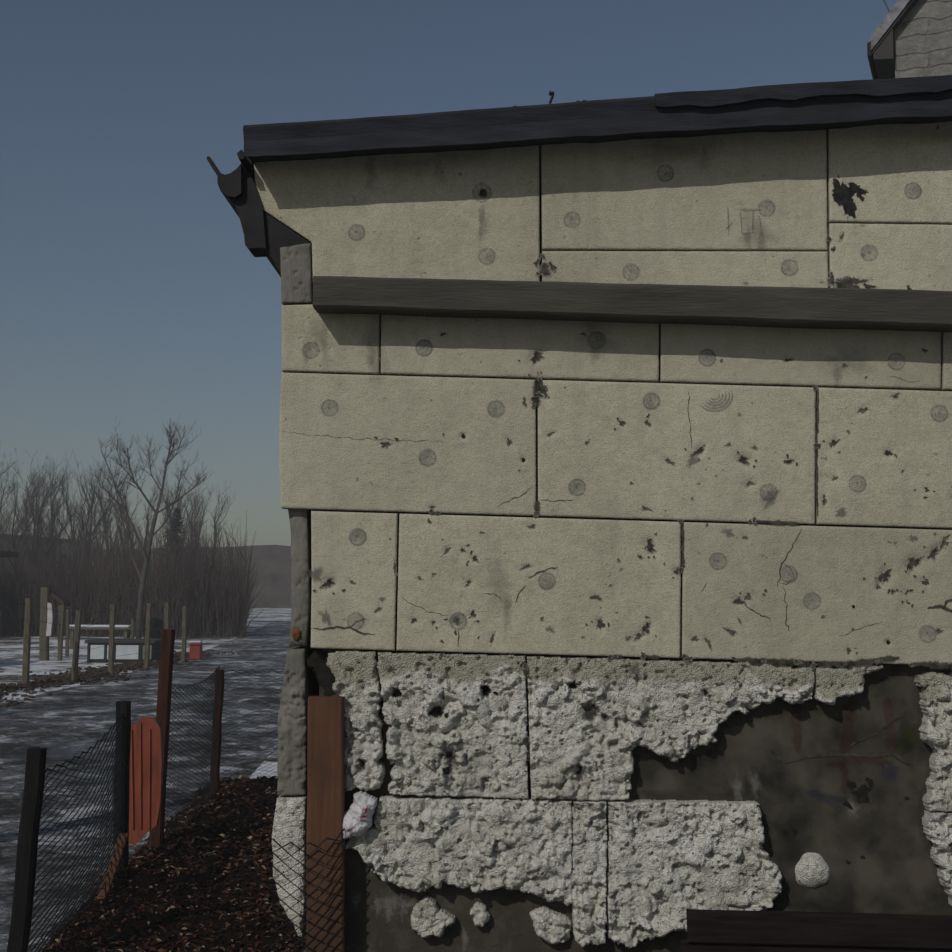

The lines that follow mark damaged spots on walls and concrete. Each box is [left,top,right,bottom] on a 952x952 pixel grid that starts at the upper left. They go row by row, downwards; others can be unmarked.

spalling [625,615,656,641]
spalling [636,667,946,914]